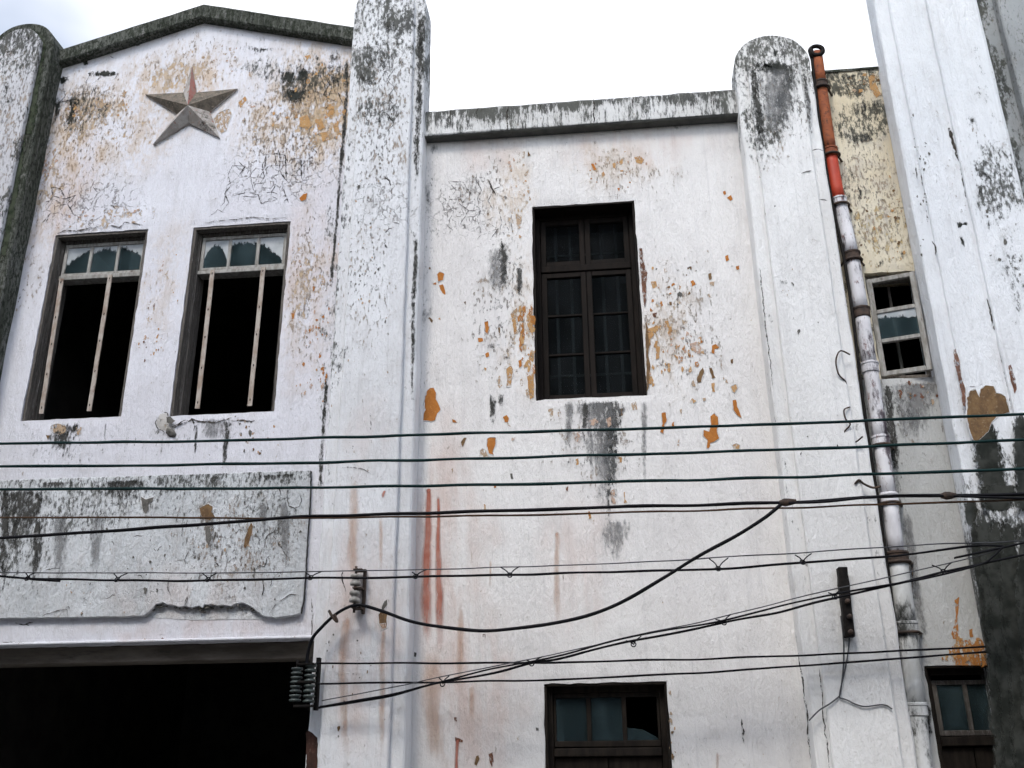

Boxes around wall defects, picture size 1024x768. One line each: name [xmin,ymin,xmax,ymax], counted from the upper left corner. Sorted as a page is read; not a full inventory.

damp [750,50,812,156]
crack [38,183,140,234]
crack [209,149,317,223]
crack [448,177,513,239]
peeling [639,248,742,419]
peeling [423,387,441,423]
peeling [953,349,1017,440]
damp [565,401,629,555]
damp [0,482,73,589]
spalling [145,604,262,620]
rust [423,489,443,627]
damp [964,416,1024,768]